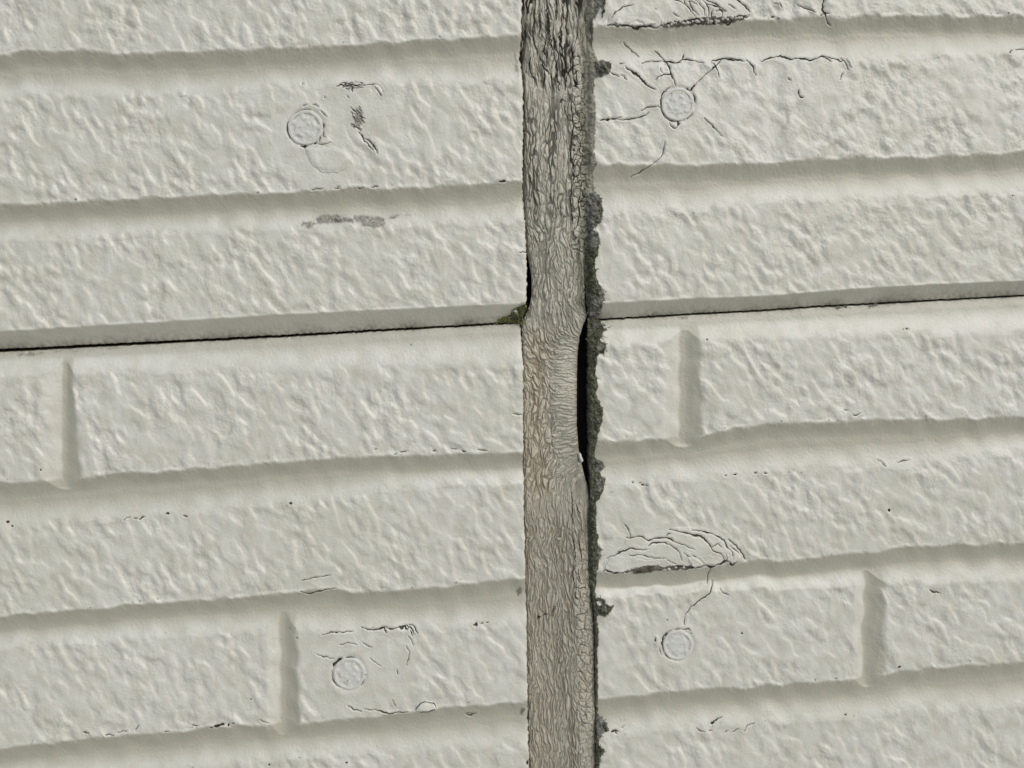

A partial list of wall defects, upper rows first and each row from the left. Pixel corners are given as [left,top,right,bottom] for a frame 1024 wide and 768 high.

crack [287,81,381,148]
crack [529,0,851,224]
peeling [603,525,745,574]
crack [319,624,418,714]